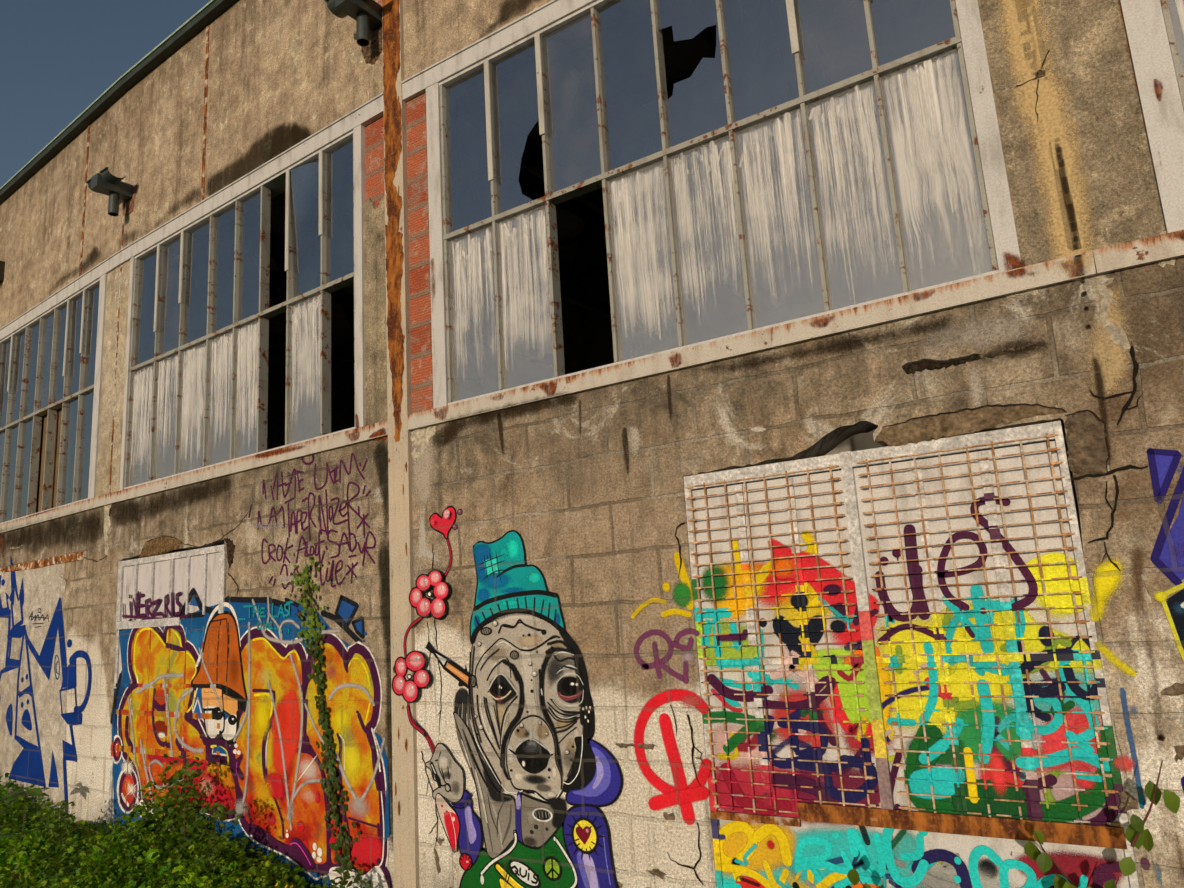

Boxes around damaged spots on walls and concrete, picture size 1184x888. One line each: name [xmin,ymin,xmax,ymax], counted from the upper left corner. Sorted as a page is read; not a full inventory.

crack [1016,50,1050,119]
corrosion [348,0,405,442]
corrosion [1005,253,1030,277]
corrosion [811,317,833,327]
spalling [902,341,1045,375]
corrosion [540,382,557,395]
crack [1090,342,1142,425]
crack [1071,465,1148,571]
spalling [139,535,182,557]
spalling [224,538,235,568]